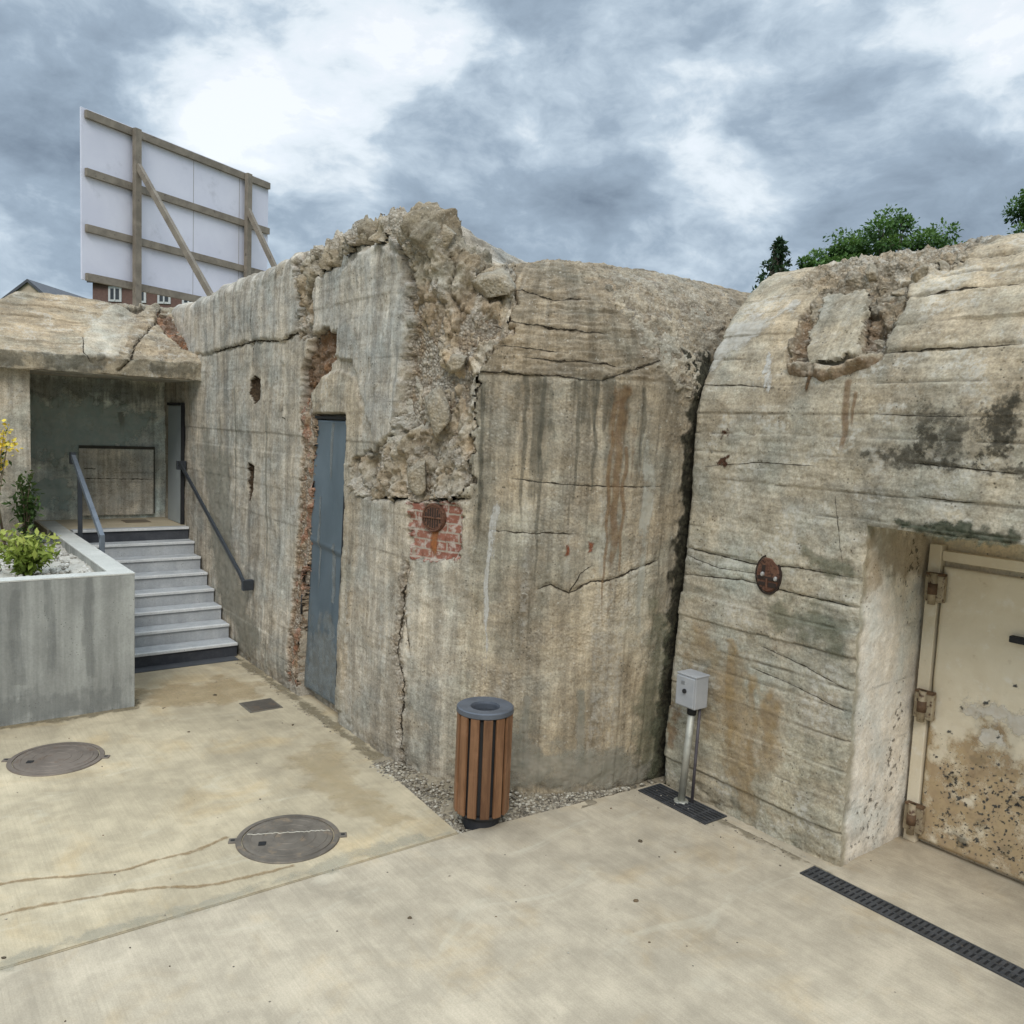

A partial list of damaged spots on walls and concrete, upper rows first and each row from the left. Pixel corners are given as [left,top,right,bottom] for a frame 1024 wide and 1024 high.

crack [120,309,161,370]
crack [477,320,660,381]
spalling [786,260,951,382]
spalling [287,201,518,689]
mould [860,385,1024,479]
crack [539,561,655,594]
leakage [510,300,800,789]
crack [685,498,859,608]
leakage [930,520,973,535]
crack [397,570,410,762]
crack [753,645,846,712]
peeling [921,726,1024,875]